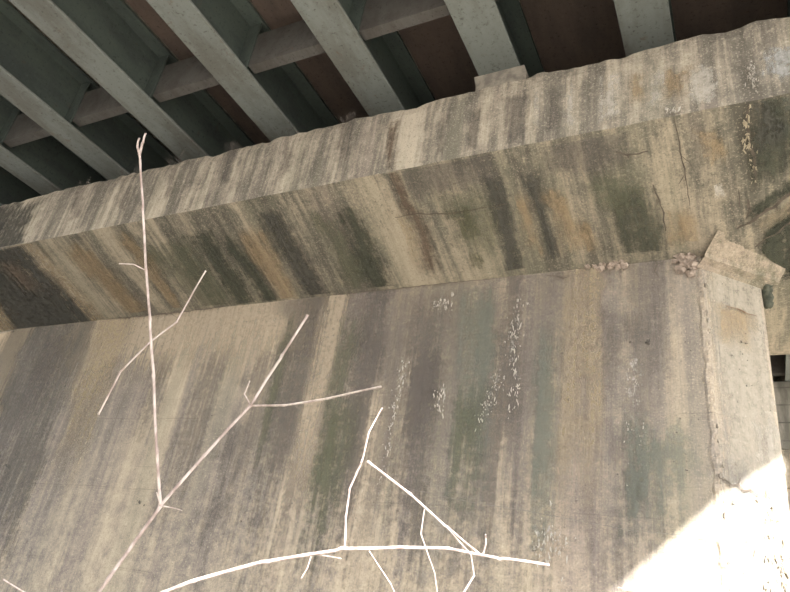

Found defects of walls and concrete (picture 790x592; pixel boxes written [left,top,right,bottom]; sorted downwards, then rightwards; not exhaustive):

damp [337,208,391,287]
damp [487,179,523,270]
damp [521,173,559,259]
damp [608,188,663,253]
crack [653,185,666,231]
crack [674,118,695,204]
damp [747,97,790,278]
damp [0,202,351,547]
damp [707,271,790,592]
crack [720,478,766,511]